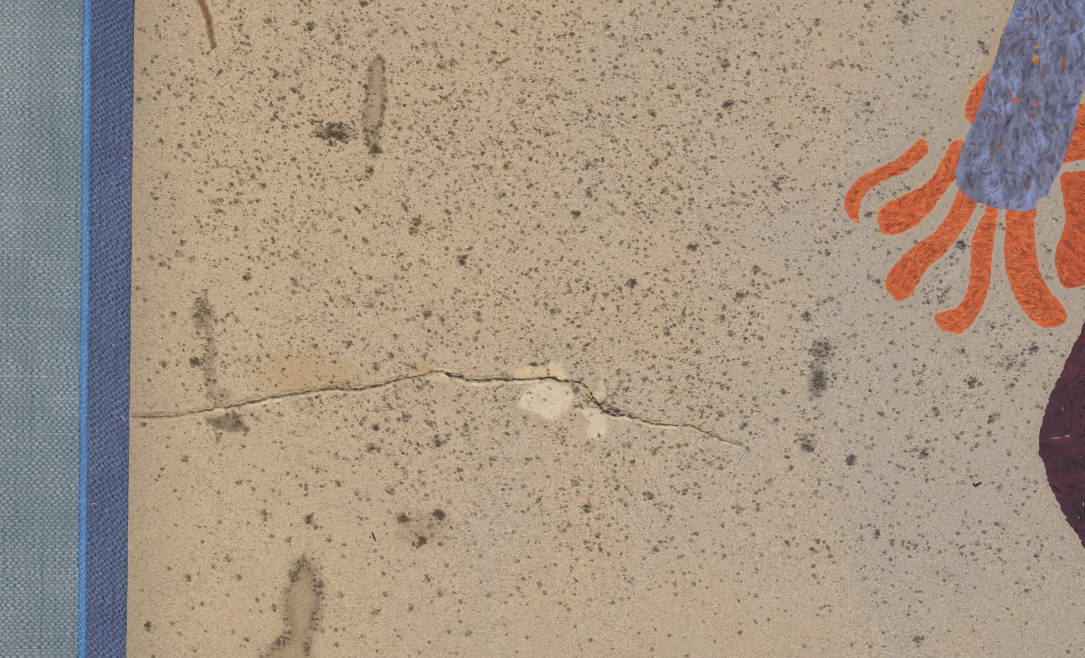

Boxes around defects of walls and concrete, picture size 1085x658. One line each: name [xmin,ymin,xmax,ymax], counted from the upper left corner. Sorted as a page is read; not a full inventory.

damp [137,0,885,464]
damp [300,325,532,492]
crack [208,361,740,448]
spalling [518,381,607,439]
damp [286,551,335,628]